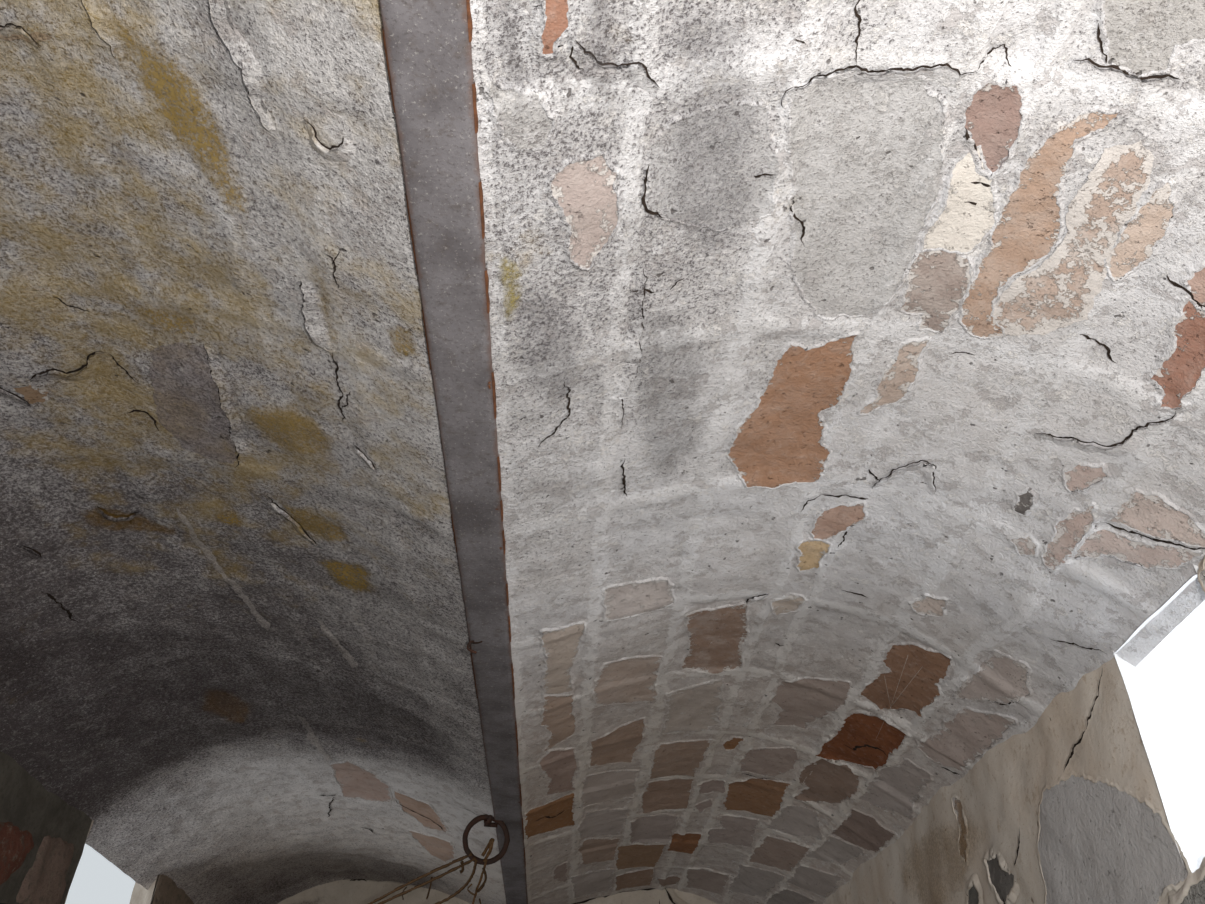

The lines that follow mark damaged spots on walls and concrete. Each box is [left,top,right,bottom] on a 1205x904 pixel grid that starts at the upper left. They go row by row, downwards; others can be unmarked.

damp [114,18,244,211]
flaking render [501,0,579,63]
crack [565,41,659,93]
crack [781,0,1011,109]
crack [1068,23,1181,98]
peeling [640,72,1180,490]
flaking render [1143,257,1205,414]
crack [1034,411,1185,457]
flaking render [794,500,868,572]
flaking render [1006,461,1205,592]
flaking render [523,601,1034,904]
crack [1049,638,1103,770]